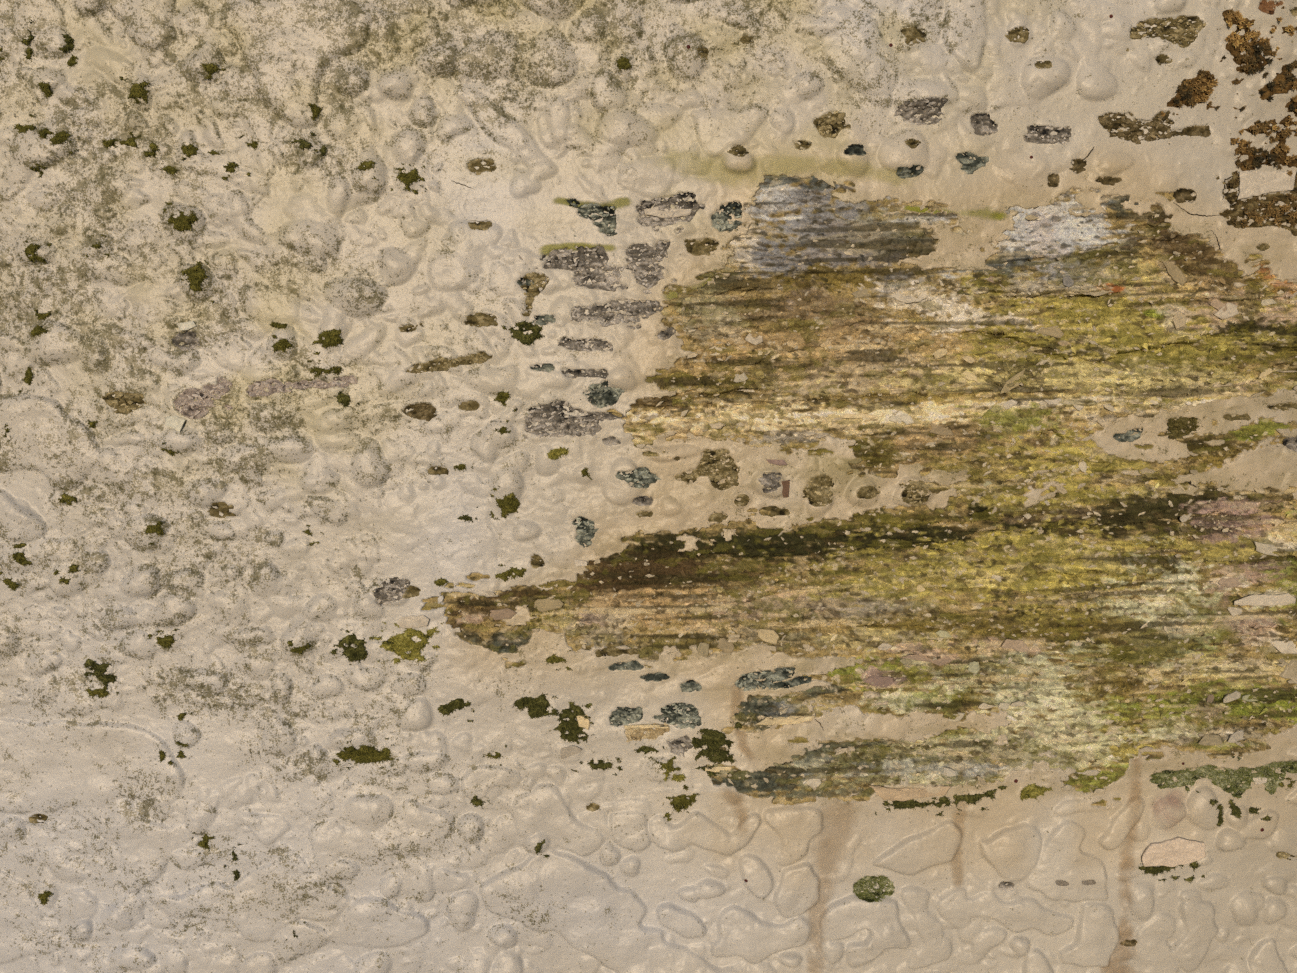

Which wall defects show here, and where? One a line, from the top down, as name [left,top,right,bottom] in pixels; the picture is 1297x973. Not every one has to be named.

peeling [1259,0,1297,16]
peeling [1126,15,1206,65]
peeling [727,145,749,157]
peeling [1024,125,1075,145]
peeling [1098,111,1211,145]
peeling [373,158,1297,816]